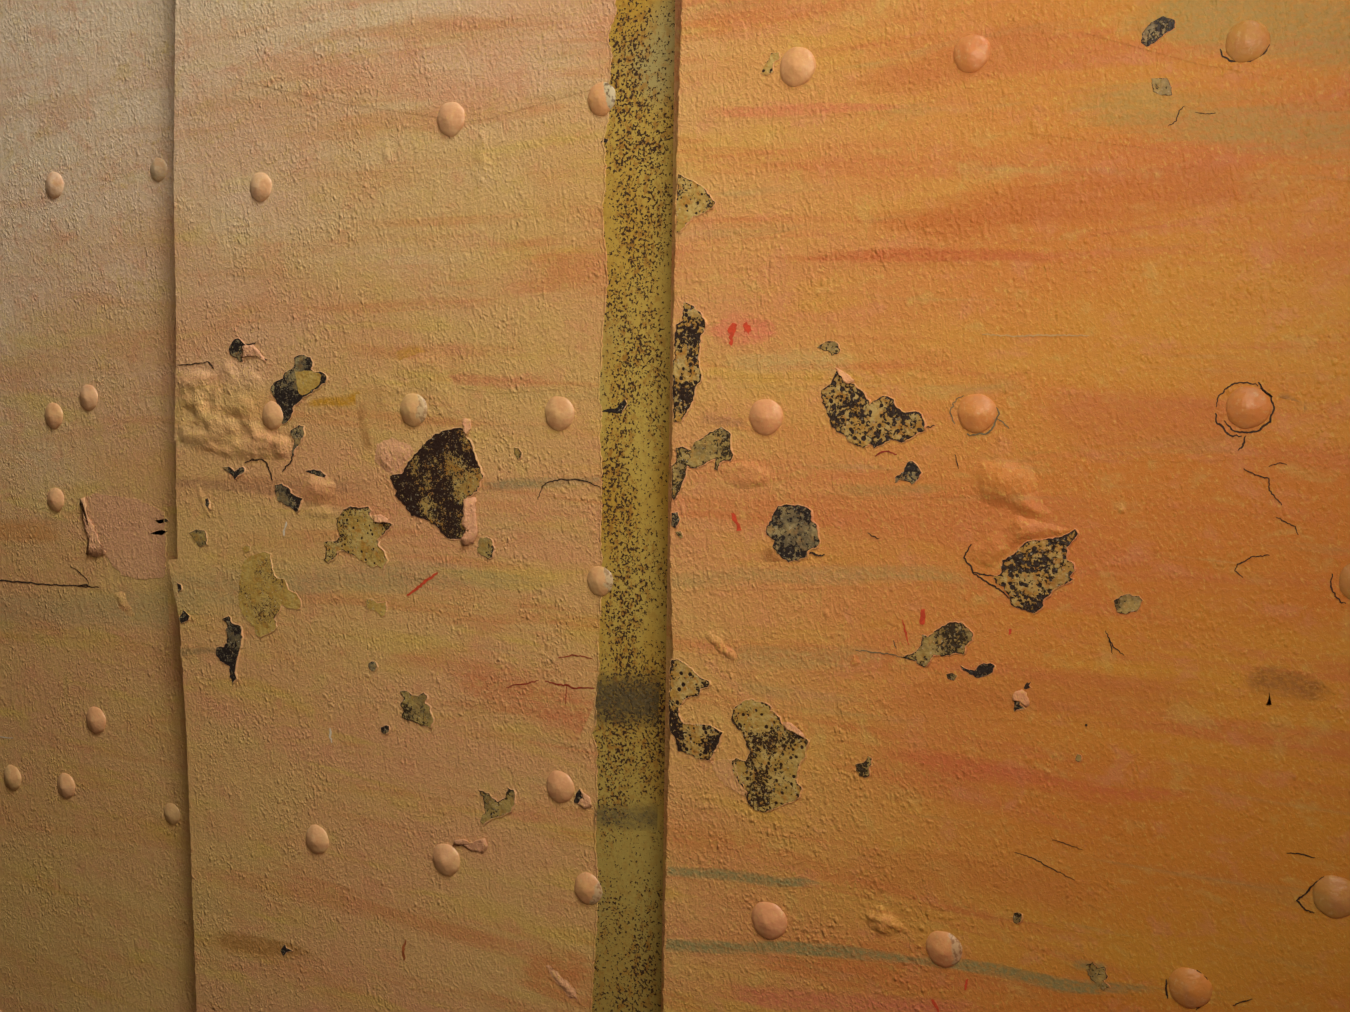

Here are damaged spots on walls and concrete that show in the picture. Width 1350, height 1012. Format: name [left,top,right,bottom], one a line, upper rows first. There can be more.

crack [0,567,99,588]
peeling [215,545,302,685]
peeling [270,354,329,514]
peeling [324,505,394,571]
peeling [390,418,496,560]
peeling [574,0,810,1012]
peeling [765,503,825,563]
peeling [817,340,935,449]
peeling [902,621,996,681]
peeling [993,528,1080,615]
crack [1234,554,1270,578]
crack [1215,382,1298,534]